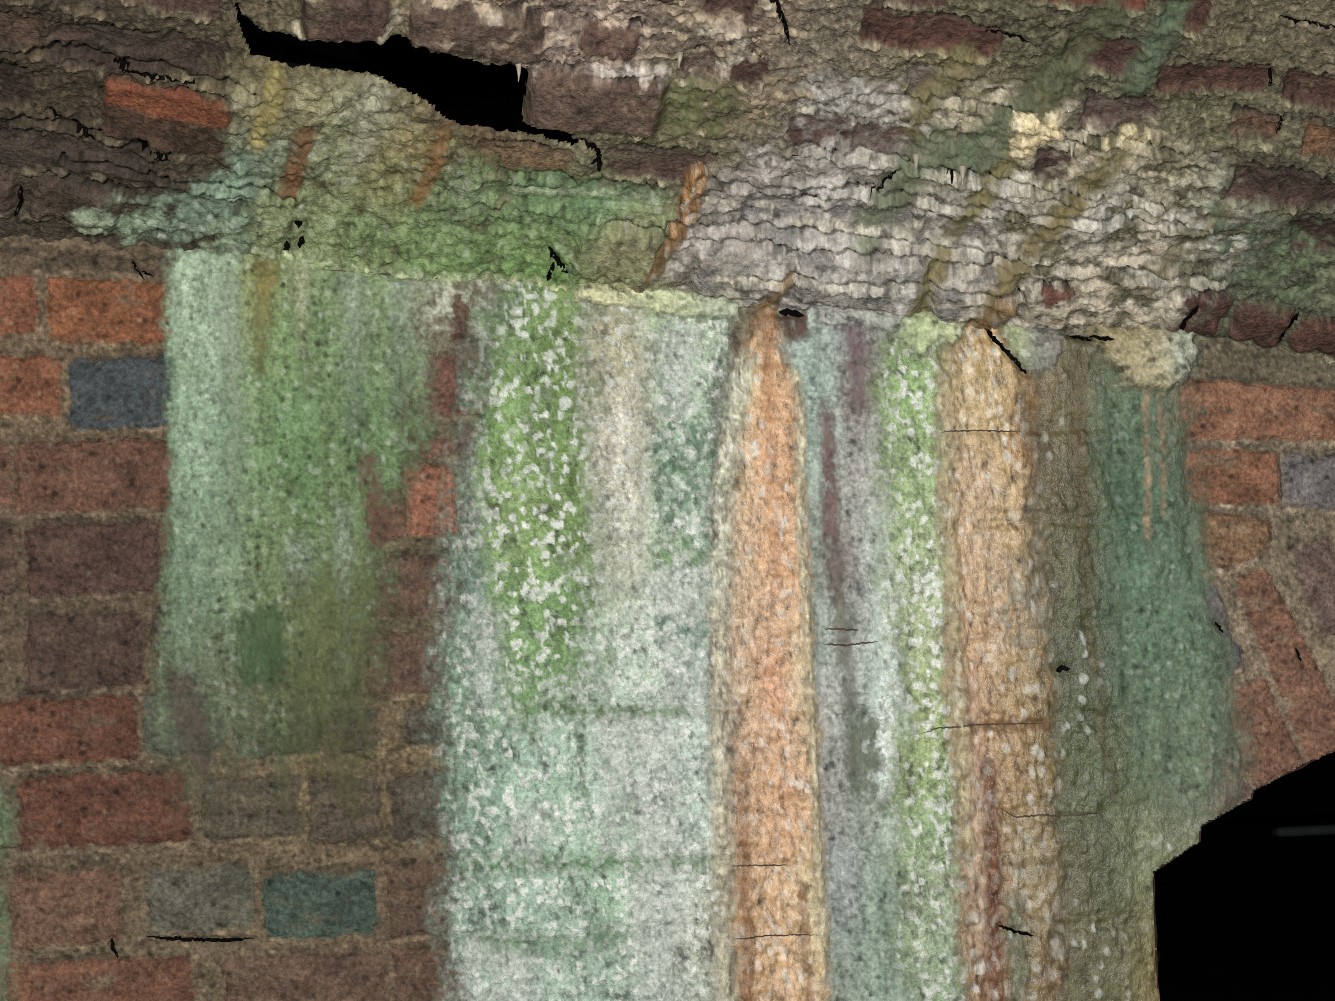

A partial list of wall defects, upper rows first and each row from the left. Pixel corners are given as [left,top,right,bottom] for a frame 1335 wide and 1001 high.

peeling [1007,110,1065,160]
peeling [1102,124,1165,153]
water stain [512,186,673,206]
peeling [921,166,1010,198]
peeling [794,216,985,255]
peeling [715,271,917,299]
spalling [779,308,804,318]
crack [1180,305,1199,331]
crack [1278,311,1300,343]
crack [984,328,1026,374]
water stain [1141,389,1167,538]
water stain [150,248,732,1001]